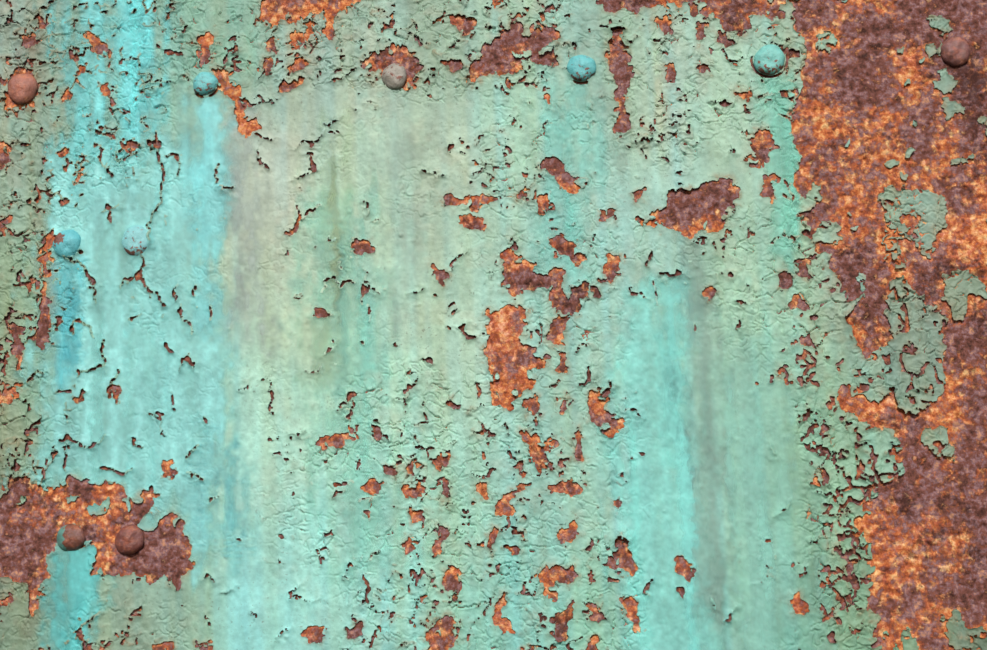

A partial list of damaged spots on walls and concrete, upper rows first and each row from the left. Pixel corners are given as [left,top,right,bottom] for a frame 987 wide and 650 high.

rust [257,0,361,100]
peeling [877,184,948,264]
crack [458,323,477,340]
rust [596,0,987,650]
peeling [941,269,987,321]
crack [337,391,389,440]
rust [475,233,625,555]
crack [575,343,640,416]
rust [0,471,195,617]
crack [344,550,380,604]
rust [534,564,579,642]
peeling [967,626,987,650]